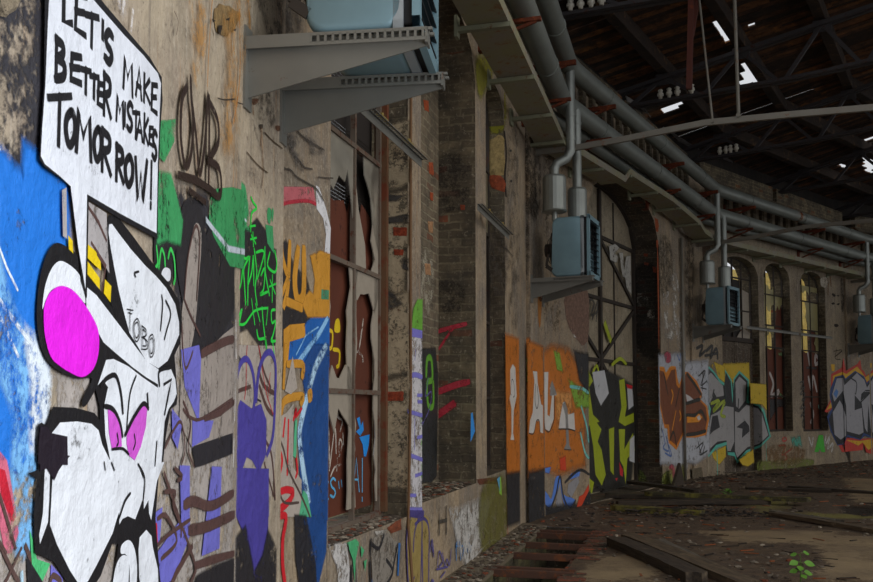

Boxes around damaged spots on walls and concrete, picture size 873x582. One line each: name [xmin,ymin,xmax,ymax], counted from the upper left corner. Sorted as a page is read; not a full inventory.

spalling [0,0,21,17]